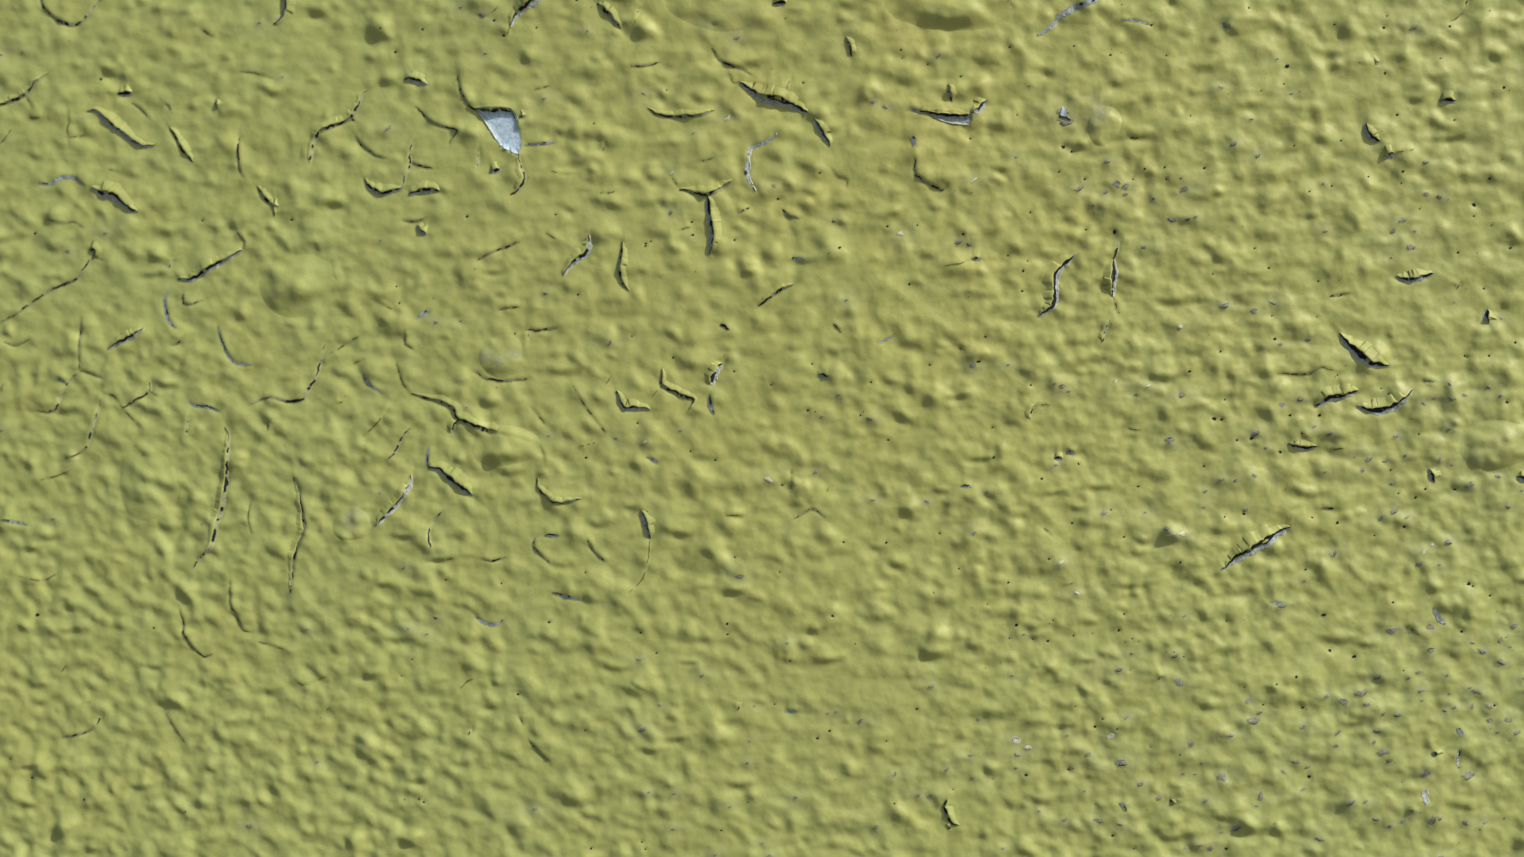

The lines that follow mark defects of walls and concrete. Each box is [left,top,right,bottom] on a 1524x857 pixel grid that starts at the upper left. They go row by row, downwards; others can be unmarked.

crack [0,71,193,346]
crack [214,71,279,216]
crack [307,71,556,236]
peeling [457,76,527,195]
crack [478,233,630,291]
crack [648,49,833,255]
crack [908,84,988,191]
crack [1037,239,1120,342]
crack [36,232,604,601]
crack [573,324,730,446]
crack [1277,333,1435,451]
crack [1221,507,1334,571]